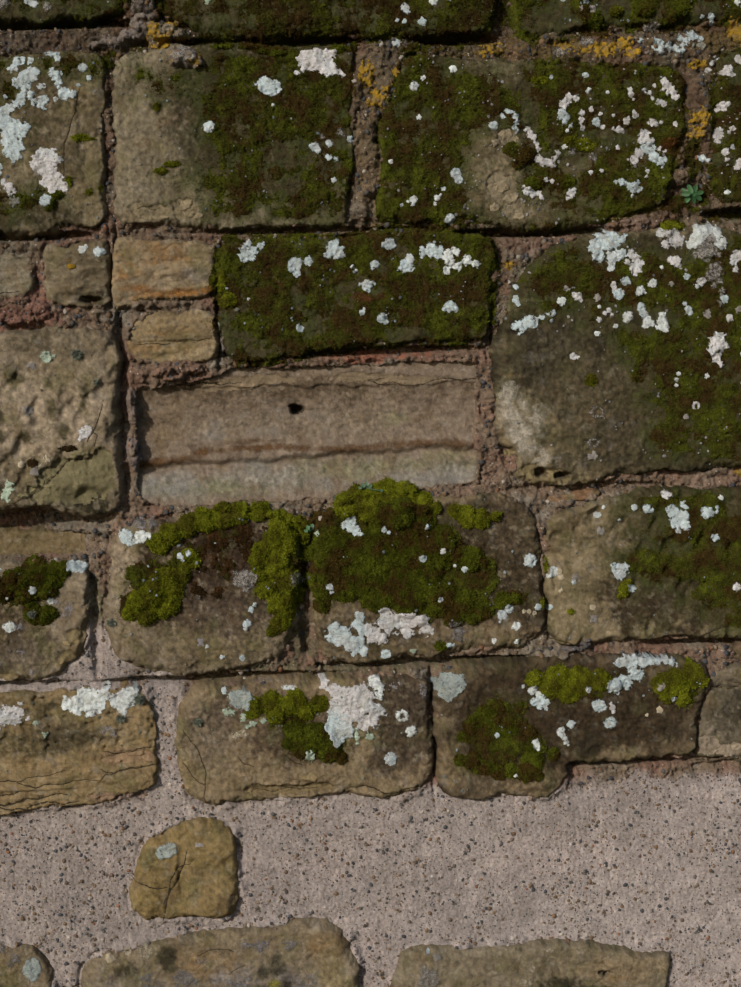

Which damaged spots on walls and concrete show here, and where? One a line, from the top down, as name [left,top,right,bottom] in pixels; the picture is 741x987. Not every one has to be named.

crack [133,851,191,921]